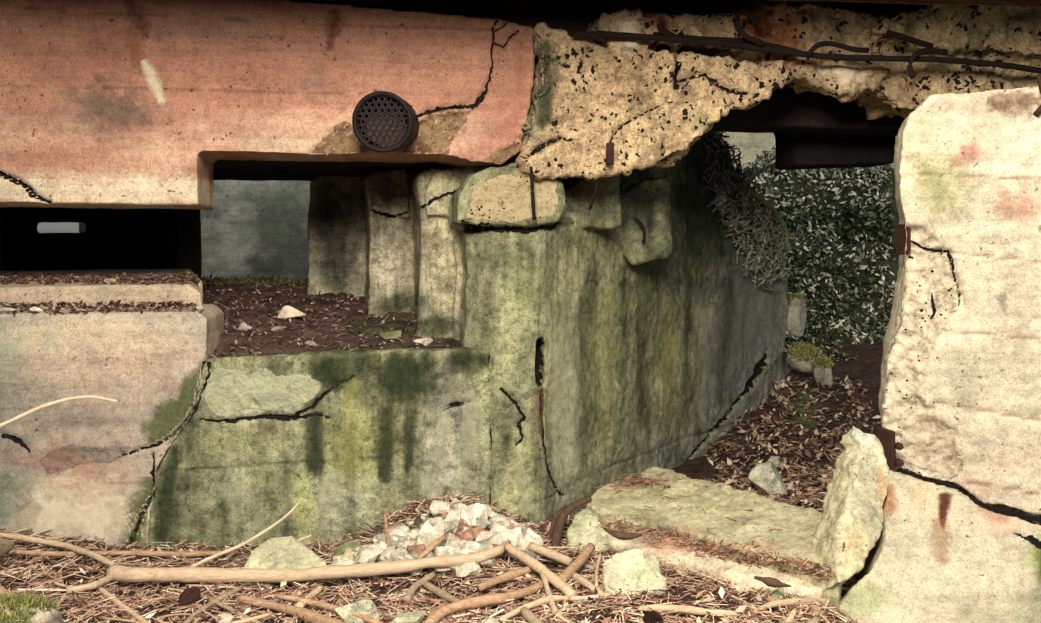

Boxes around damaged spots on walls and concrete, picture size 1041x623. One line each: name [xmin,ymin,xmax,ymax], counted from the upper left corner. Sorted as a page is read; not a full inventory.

crack [417,20,519,117]
spalling [567,9,1041,117]
crack [0,171,51,204]
crack [459,220,560,234]
spalling [606,143,614,165]
crack [907,239,961,319]
crack [118,361,355,545]
water stain [308,413,322,475]
water stain [377,407,415,481]
crack [489,340,564,506]
crack [687,353,767,460]
crack [896,469,1041,549]